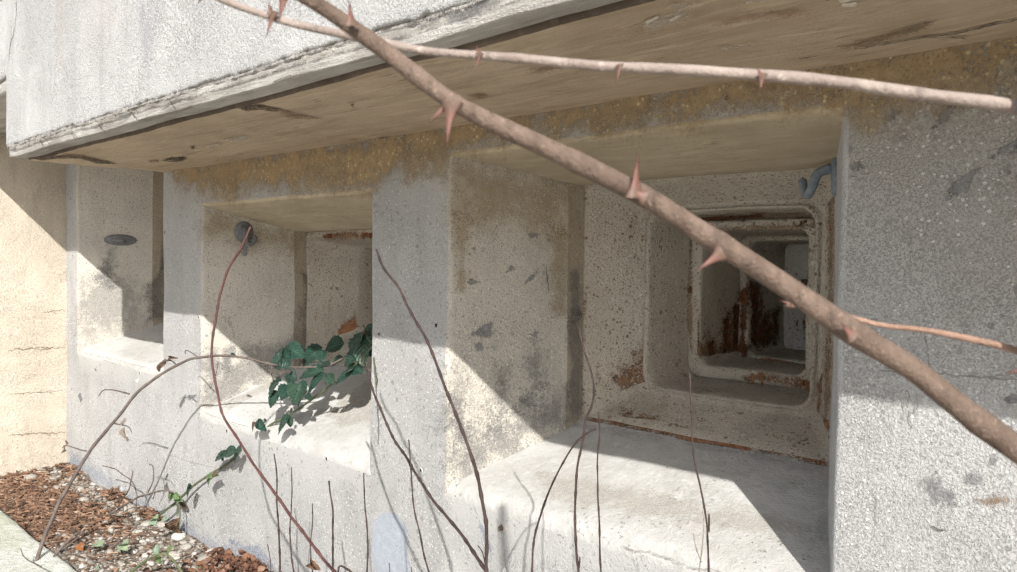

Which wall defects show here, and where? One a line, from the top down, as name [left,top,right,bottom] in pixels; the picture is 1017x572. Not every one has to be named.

water stain [801,36,1017,94]
water stain [241,105,317,119]
water stain [506,80,910,140]
water stain [149,123,505,196]
corrosion [322,232,372,240]
corrosion [338,314,372,334]
corrosion [695,274,799,364]
corrosion [743,372,822,412]
corrosion [582,404,826,466]